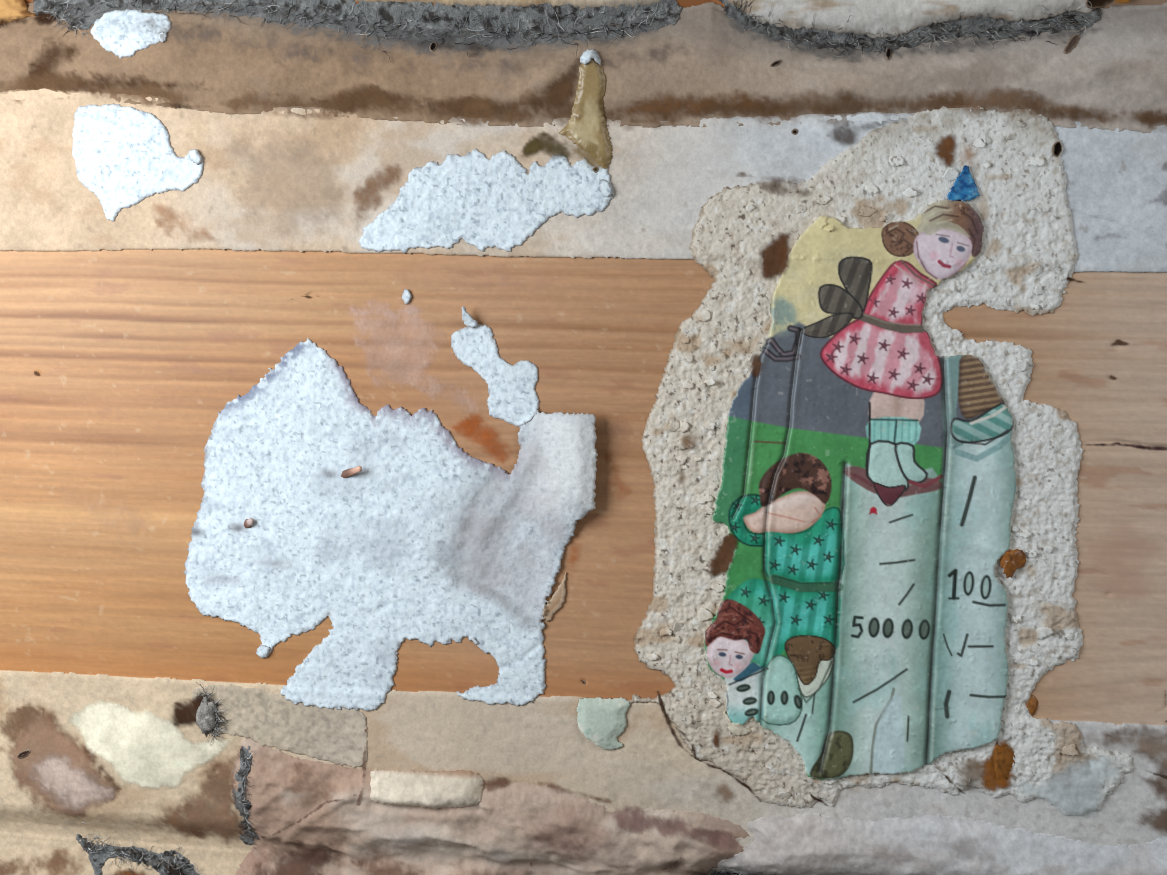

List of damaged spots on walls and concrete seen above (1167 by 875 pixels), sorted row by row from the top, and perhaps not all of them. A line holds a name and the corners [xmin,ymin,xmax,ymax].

damp [35,12,57,24]
damp [31,48,74,76]
damp [70,77,174,92]
damp [438,66,577,111]
damp [627,94,777,117]
damp [937,90,1087,117]
damp [1136,111,1167,121]
peeling [402,289,412,304]
peeling [183,306,598,711]
damp [2,707,115,817]
rust [962,742,1015,791]